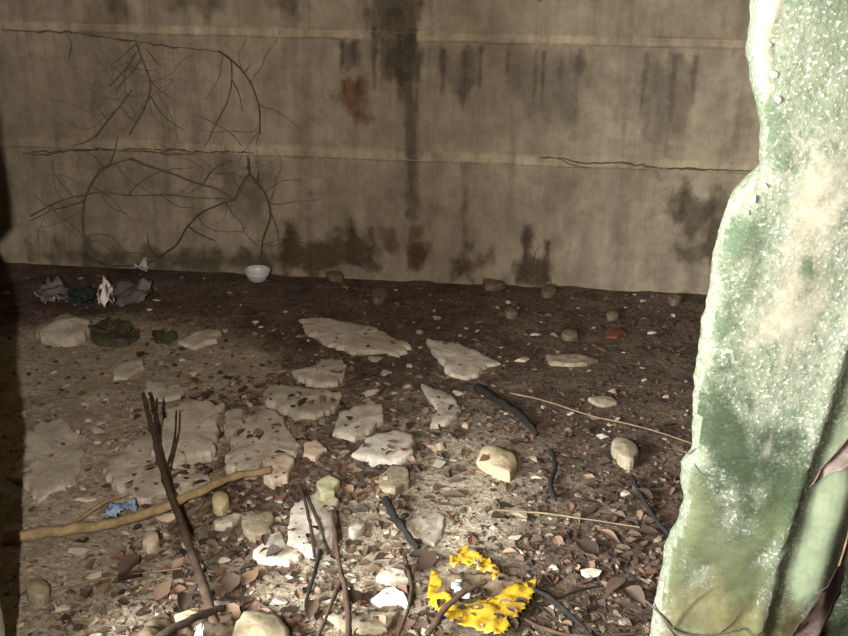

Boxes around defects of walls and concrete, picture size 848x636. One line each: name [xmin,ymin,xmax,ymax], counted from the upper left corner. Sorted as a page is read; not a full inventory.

damp [373,0,422,80]
damp [406,101,417,217]
crack [541,157,753,172]
damp [232,226,379,278]
corrosion [407,244,428,270]
damp [516,226,550,286]
damp [676,190,720,258]
damp [751,156,847,353]